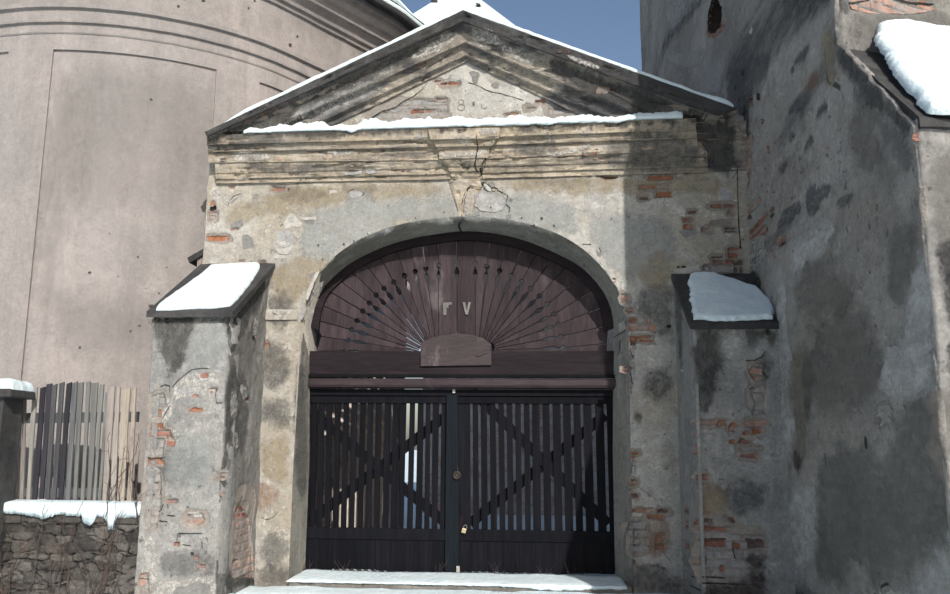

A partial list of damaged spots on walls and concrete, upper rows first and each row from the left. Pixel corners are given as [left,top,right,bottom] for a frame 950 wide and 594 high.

flaking render [849,0,935,15]
damp [295,78,425,139]
damp [439,126,486,158]
crack [458,135,513,232]
flaking render [674,179,793,274]
damp [937,241,950,317]
damp [152,317,204,376]
damp [638,254,724,412]
flaking render [690,360,773,463]
flaking render [137,371,250,594]
flaking render [228,482,264,578]
flaking render [620,448,770,594]